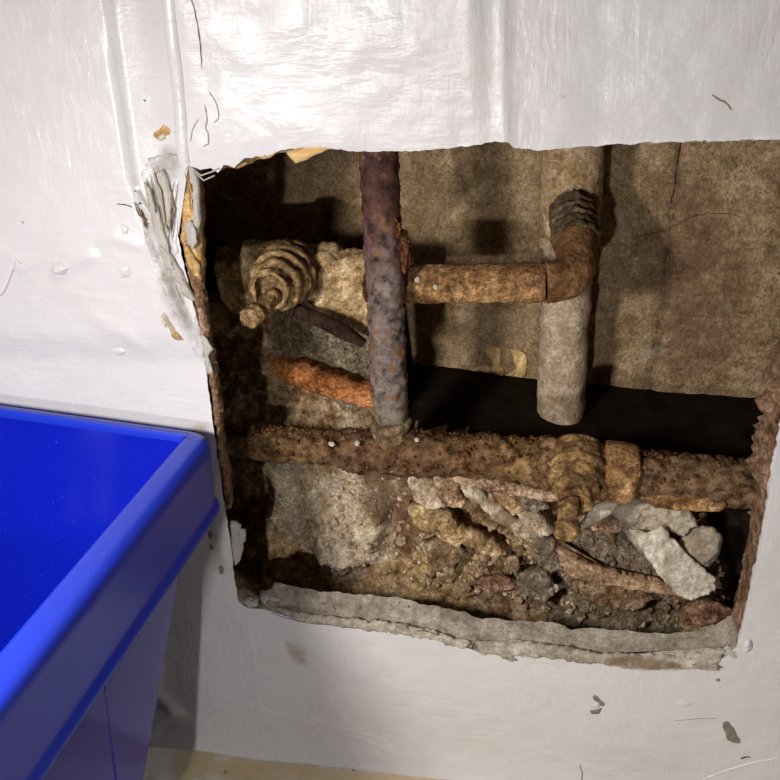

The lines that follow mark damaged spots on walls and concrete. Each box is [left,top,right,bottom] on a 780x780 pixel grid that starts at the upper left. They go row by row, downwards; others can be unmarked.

corrosion [393,216,413,276]
peeling [133,153,234,511]
peeling [230,520,246,565]
corrosion [366,474,415,554]
flaking render [579,501,619,530]
corrosion [638,493,728,512]
spalling [244,588,753,682]